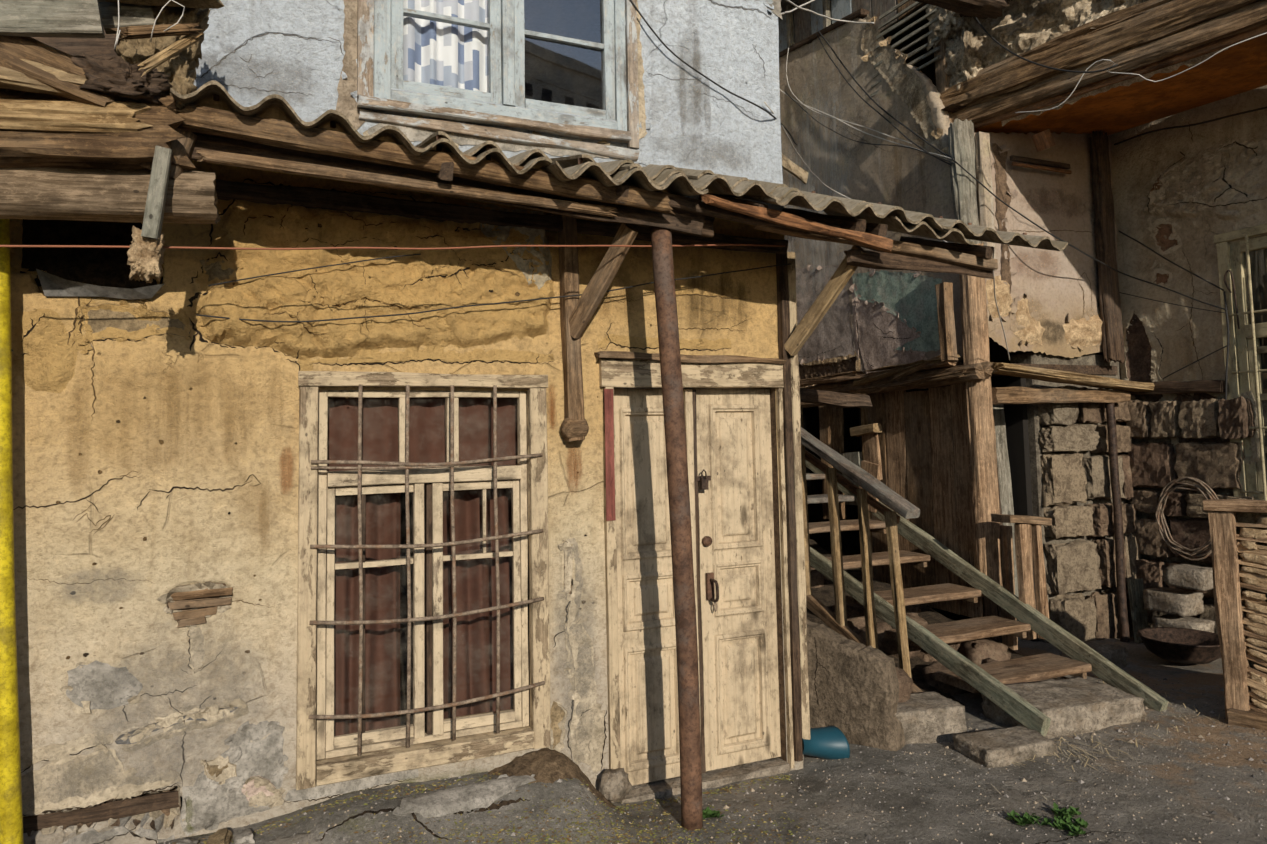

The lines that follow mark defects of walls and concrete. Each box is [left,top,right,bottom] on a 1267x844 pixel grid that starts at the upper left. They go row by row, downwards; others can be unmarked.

crack [196,20,344,96]
crack [12,199,554,421]
flaking render [796,263,942,388]
spalling [1063,313,1103,352]
crack [13,471,261,534]
flaking render [60,653,143,714]
flaking render [21,698,289,837]
crack [285,769,530,841]